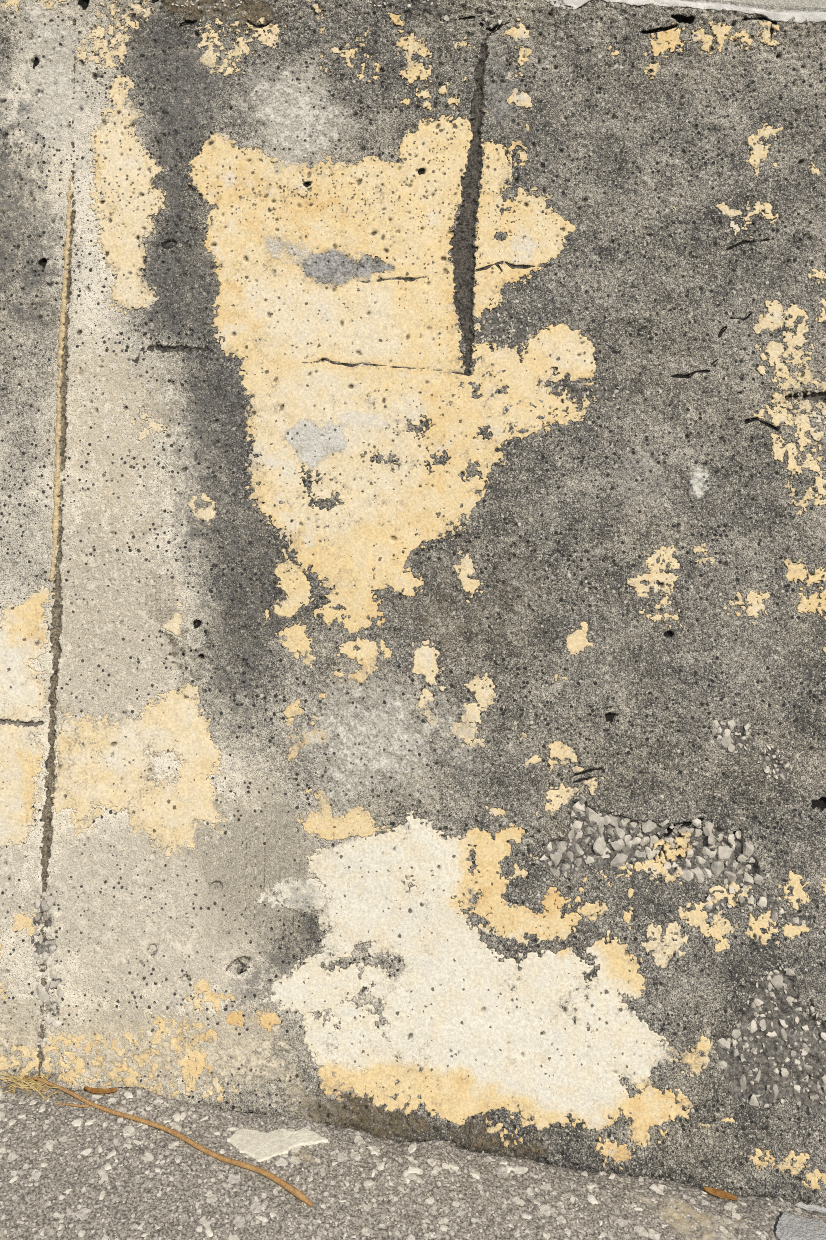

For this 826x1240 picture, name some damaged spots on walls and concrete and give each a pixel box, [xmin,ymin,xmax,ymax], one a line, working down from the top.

crack [449,16,554,376]
crack [323,358,398,368]
peeling [172,0,622,683]
peeling [753,269,826,516]
peeling [627,545,682,628]
peeling [723,590,770,624]
peeling [784,558,826,620]
peeling [0,585,227,857]
peeling [283,699,329,762]
peeling [412,639,496,748]
spalling [711,720,794,780]
peeling [0,741,826,1240]